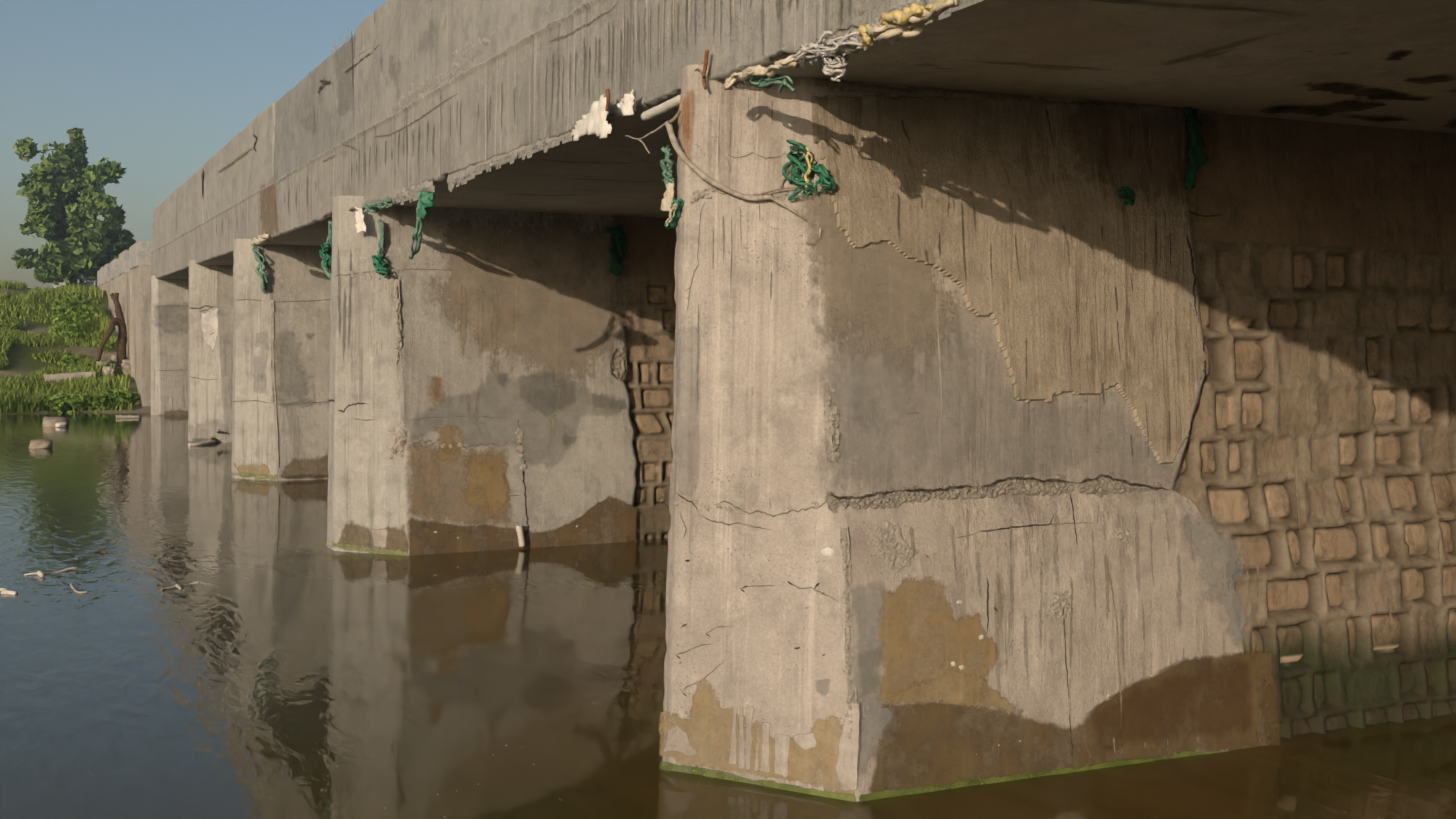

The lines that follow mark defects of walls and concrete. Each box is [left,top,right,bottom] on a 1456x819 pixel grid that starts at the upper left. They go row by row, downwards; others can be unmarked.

damp [339,497,638,556]
crack [664,492,825,538]
crack [954,491,1099,629]
damp [1054,519,1073,666]
damp [836,556,1280,793]
damp [664,726,697,755]
damp [729,706,816,777]